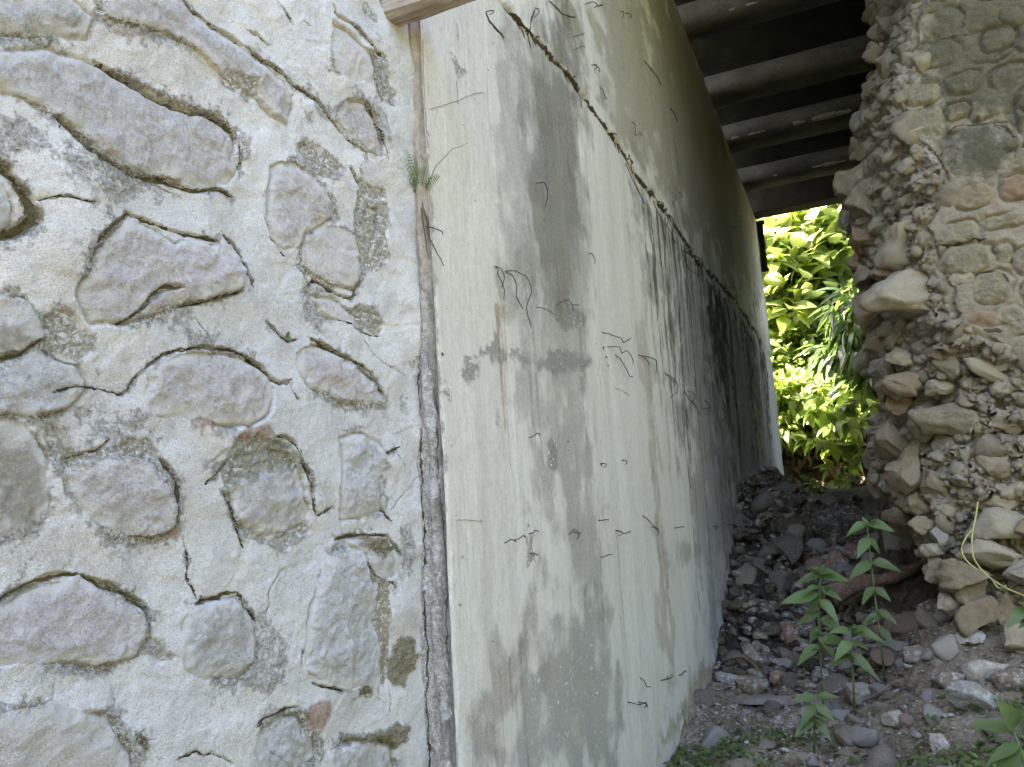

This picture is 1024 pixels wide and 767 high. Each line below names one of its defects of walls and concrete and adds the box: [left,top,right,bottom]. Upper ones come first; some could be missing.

crack [264,217,482,767]
leakage [501,0,591,495]
crack [486,0,757,335]
leakage [643,203,782,550]
crack [257,707,291,728]